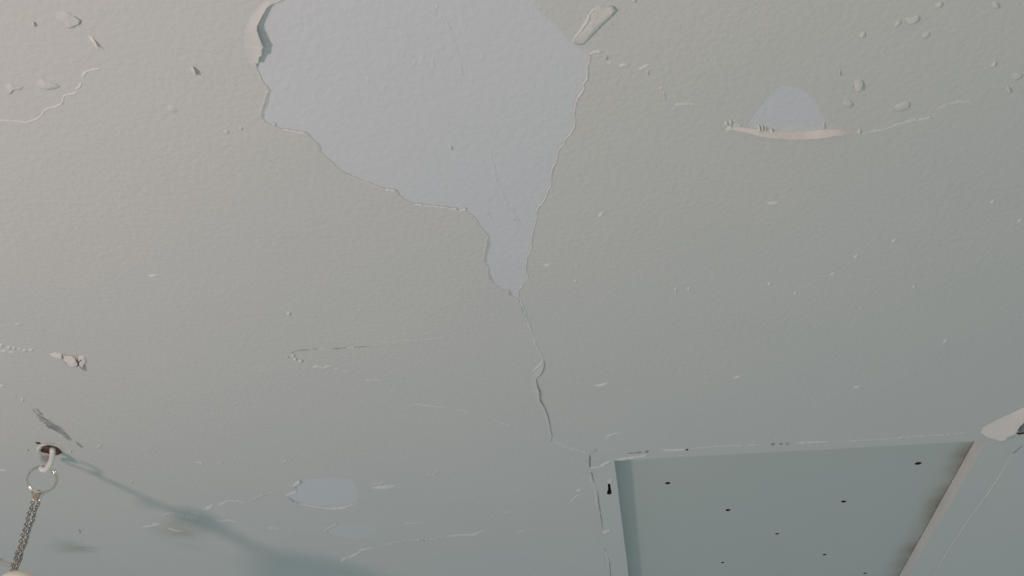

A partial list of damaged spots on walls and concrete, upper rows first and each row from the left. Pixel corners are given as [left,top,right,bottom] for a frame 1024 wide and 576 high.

crack [0,68,100,123]
peeling [724,85,861,140]
peeling [244,0,603,297]
peeling [981,408,1024,443]